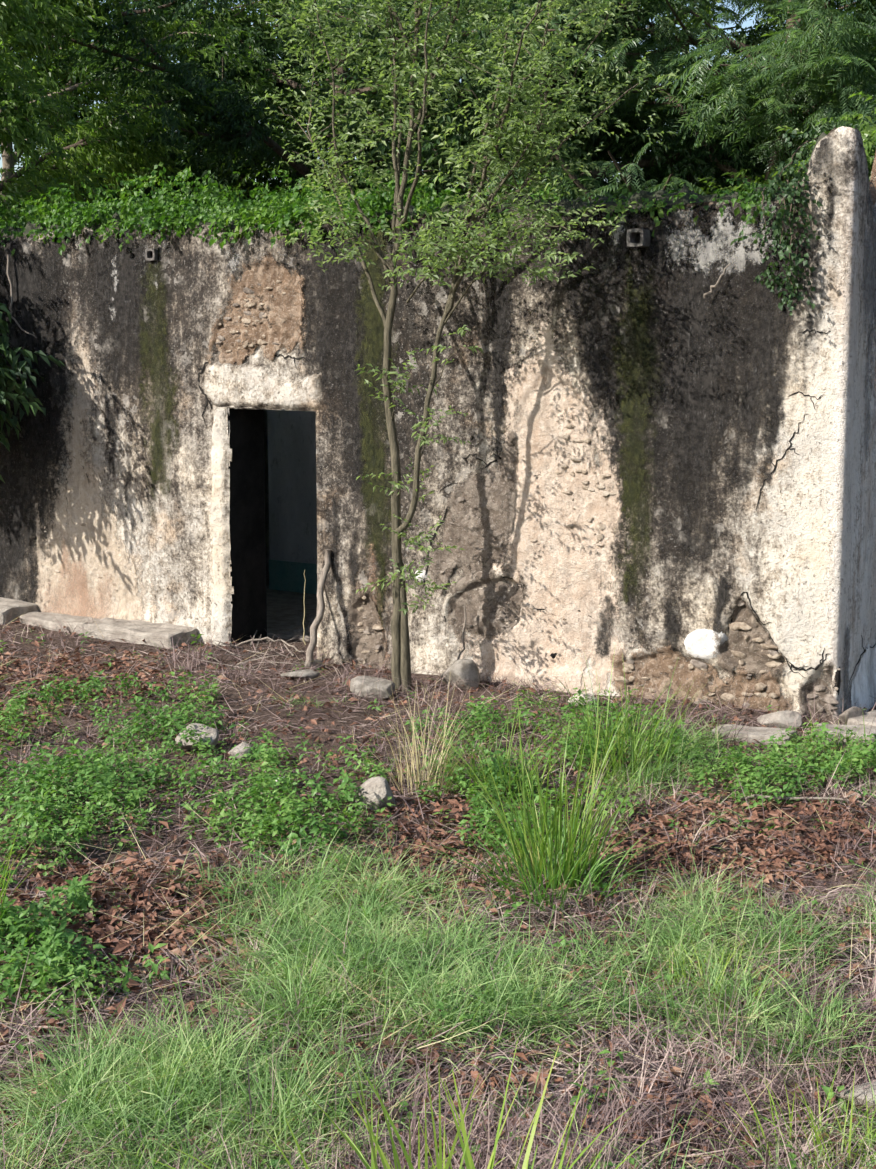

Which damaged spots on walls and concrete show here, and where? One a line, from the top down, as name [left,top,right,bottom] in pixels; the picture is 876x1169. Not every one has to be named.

damp [0,229,158,605]
spalling [205,249,307,366]
damp [294,218,374,594]
damp [375,554,387,628]
damp [478,244,520,463]
damp [594,595,614,657]
peeling [415,321,843,723]
damp [663,598,680,652]
damp [564,138,858,634]
crack [756,391,824,509]
damp [862,191,876,383]